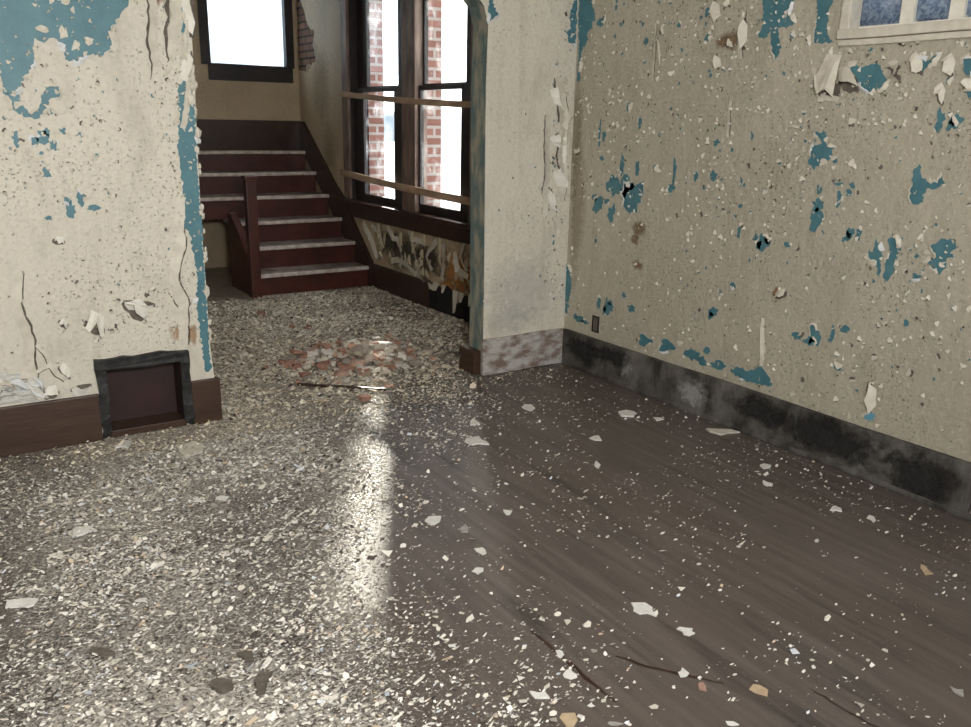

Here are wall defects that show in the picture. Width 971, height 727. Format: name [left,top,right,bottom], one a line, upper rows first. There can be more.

flaking render [295,0,317,74]
peeling [0,0,144,222]
peeling [37,0,212,372]
peeling [539,0,971,428]
flaking render [376,223,470,323]
peeling [0,373,49,405]
crack [10,272,68,395]
leakage [567,339,629,373]
leakage [678,381,705,407]
leakage [734,394,954,502]